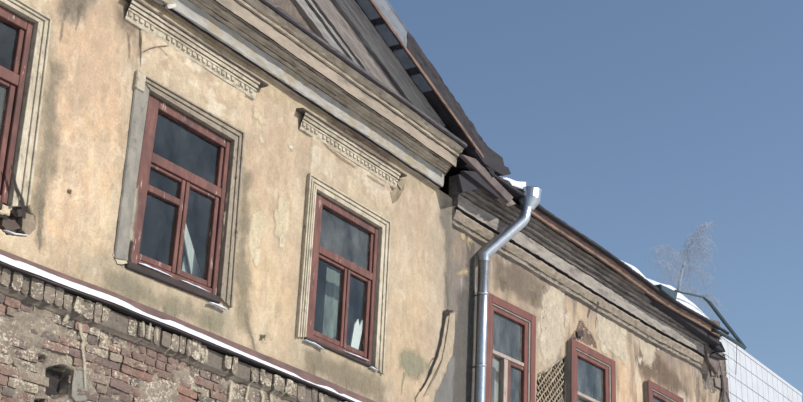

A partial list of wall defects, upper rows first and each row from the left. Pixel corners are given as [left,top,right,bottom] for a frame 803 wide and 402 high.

spalling [0,165,36,235]
spalling [112,187,138,268]
water stain [401,351,429,390]
crack [415,309,455,401]
water stain [435,206,478,402]
peeling [536,286,627,402]
peeling [638,338,659,367]